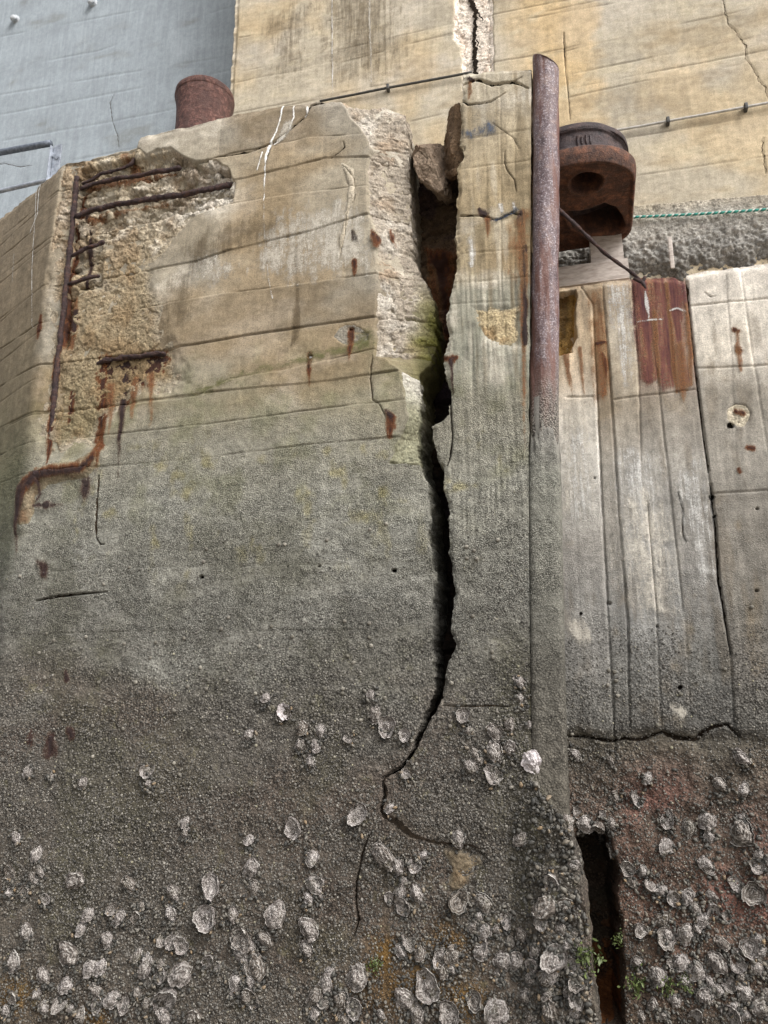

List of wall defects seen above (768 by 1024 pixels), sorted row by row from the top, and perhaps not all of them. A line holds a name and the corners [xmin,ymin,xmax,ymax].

crack [463,0,525,188]
corrosion [13,349,171,549]
spalling [38,148,236,469]
leakage [256,106,370,299]
corrosion [350,229,394,247]
spalling [334,104,443,469]
corrosion [385,409,396,439]
crack [417,175,516,309]
corrosion [630,277,695,400]
crack [686,284,728,640]
crack [413,379,510,752]
crack [571,724,738,742]